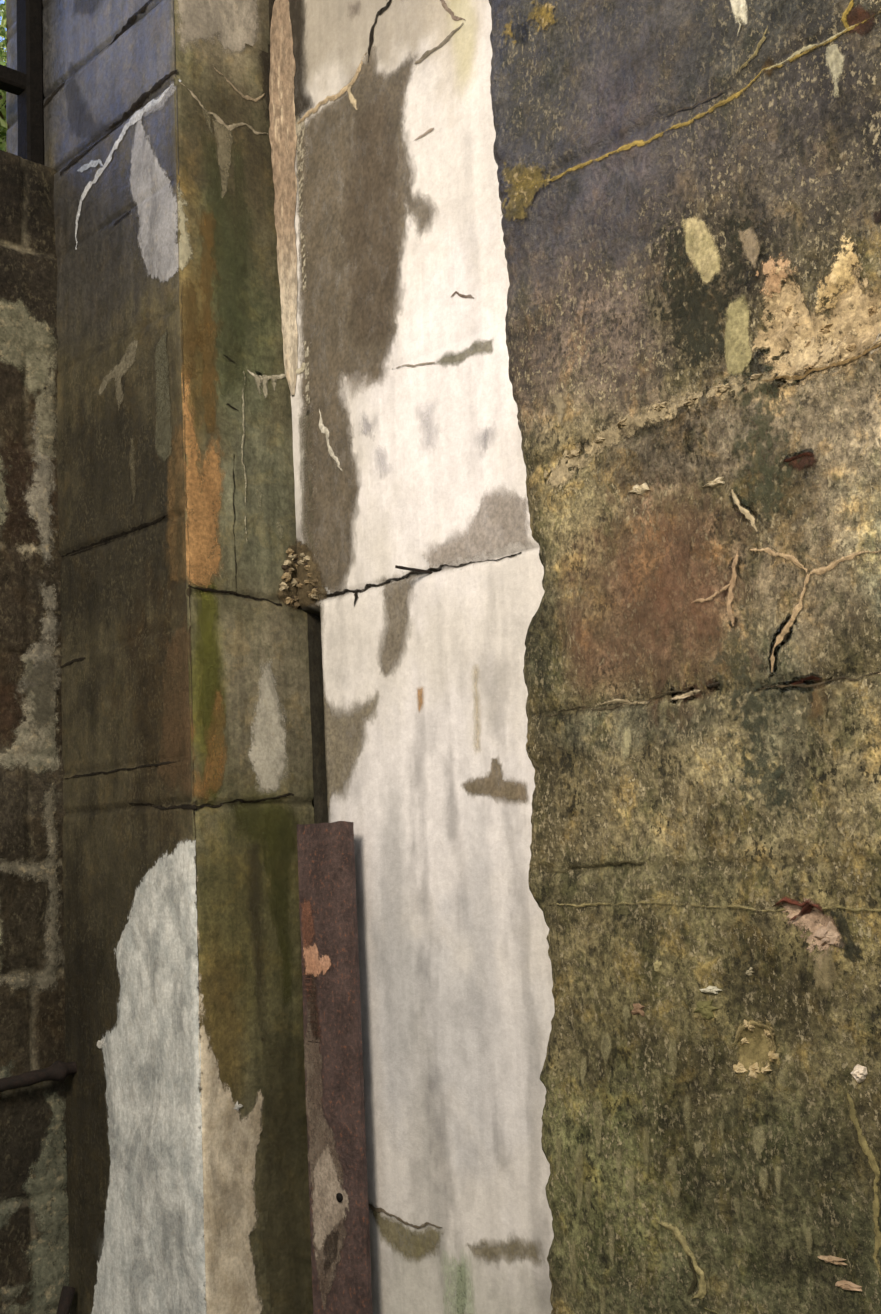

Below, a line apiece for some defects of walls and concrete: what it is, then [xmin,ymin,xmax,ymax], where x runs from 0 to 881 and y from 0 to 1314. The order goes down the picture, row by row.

crack [60,0,391,250]
crack [414,0,466,64]
crack [541,11,881,182]
rust [167,212,222,588]
crack [326,552,521,606]
peeling [628,483,650,495]
spalling [543,235,881,493]
crack [691,489,881,689]
peeling [92,839,264,1314]
peeling [0,1092,70,1314]